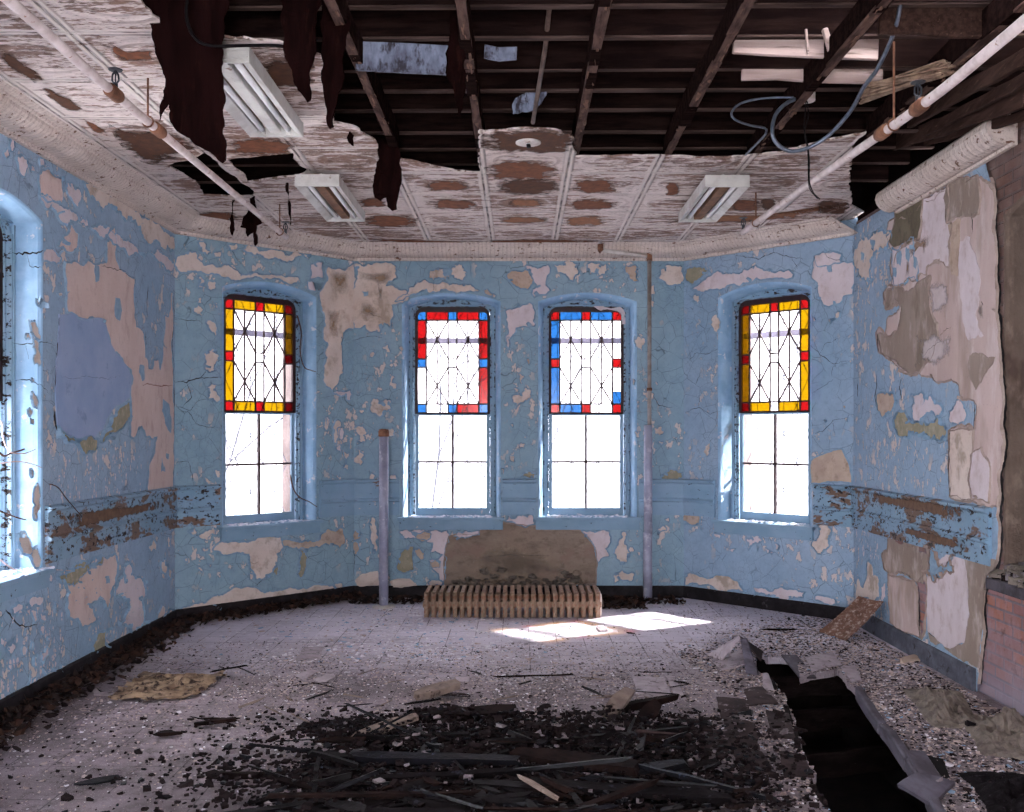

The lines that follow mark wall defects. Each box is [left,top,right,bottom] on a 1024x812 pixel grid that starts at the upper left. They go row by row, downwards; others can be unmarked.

crack [143,374,218,427]
peeling [2,138,497,526]
flaking render [809,174,1006,668]
peeling [0,516,379,699]
flaking render [396,513,641,589]